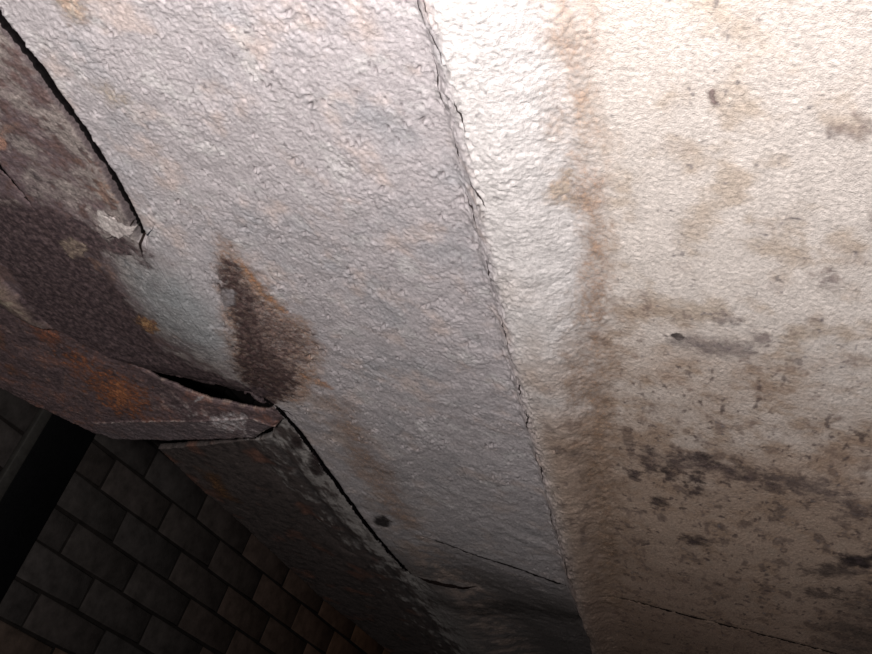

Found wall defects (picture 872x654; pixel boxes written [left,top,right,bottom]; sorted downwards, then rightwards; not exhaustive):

crack [417,0,465,156]
crack [0,10,154,259]
crack [465,179,487,228]
leakage [675,337,752,355]
crack [260,396,476,589]
crack [435,508,567,586]
crack [617,597,836,654]